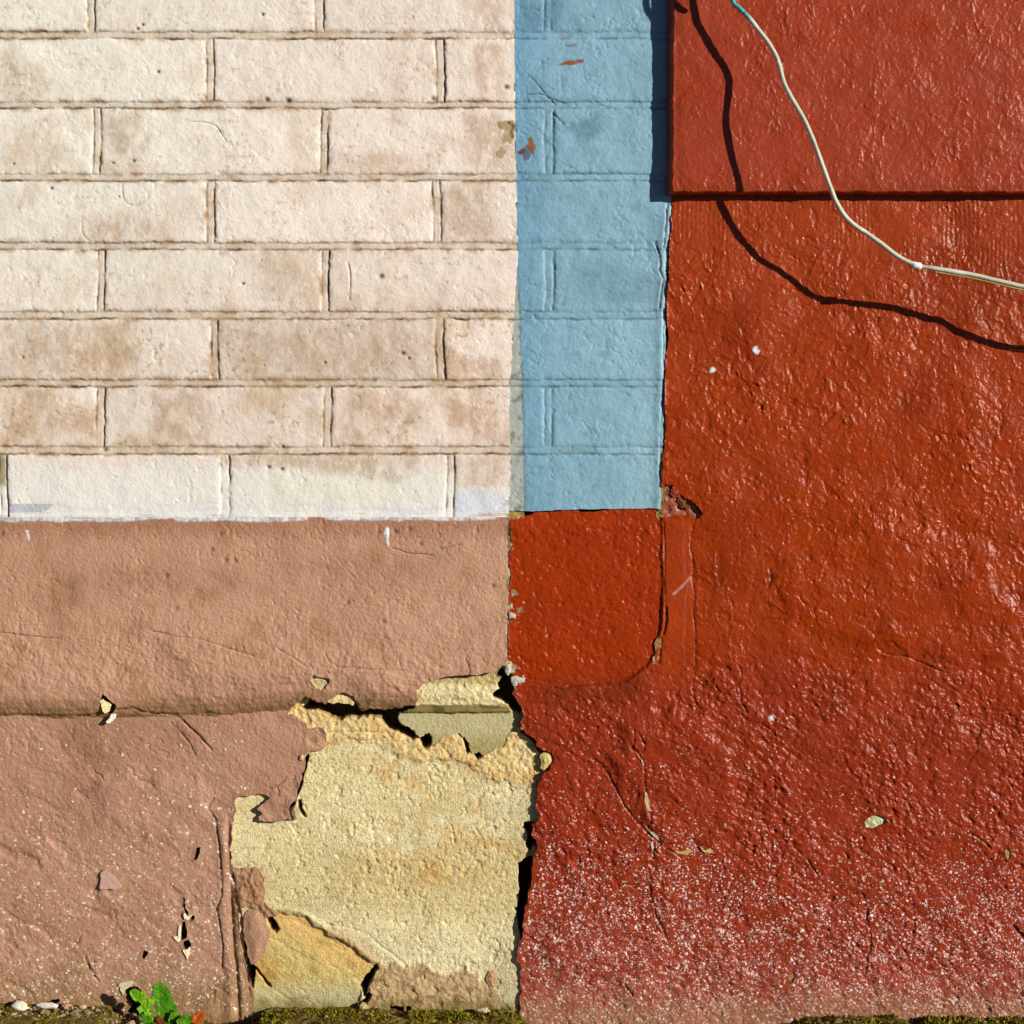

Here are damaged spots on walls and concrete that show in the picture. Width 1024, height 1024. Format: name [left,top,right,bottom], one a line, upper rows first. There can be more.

peeling [496,121,535,160]
flaking render [655,485,702,520]
peeling [100,696,116,723]
flaking render [230,660,554,1021]
peeling [174,903,195,959]